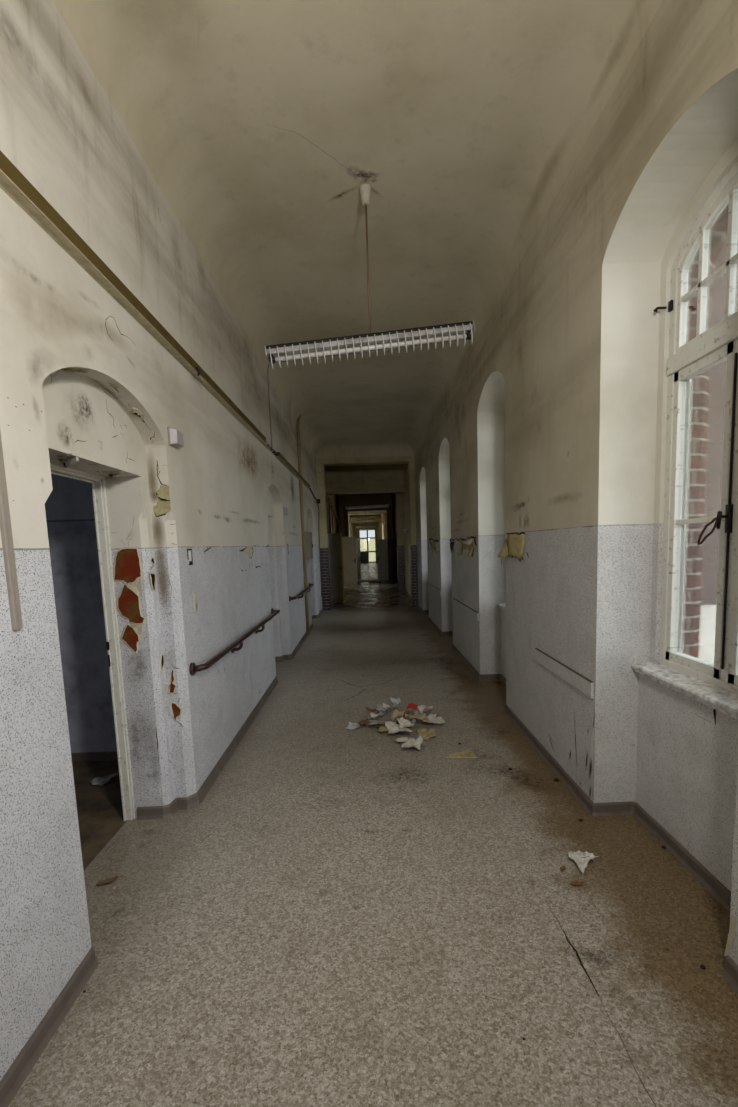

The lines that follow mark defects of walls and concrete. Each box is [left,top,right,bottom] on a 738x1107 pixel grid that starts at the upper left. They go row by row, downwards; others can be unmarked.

peeling [153,461,171,517]
flaking render [113,519,156,654]
flaking render [160,654,183,726]
crack [546,901,656,1107]